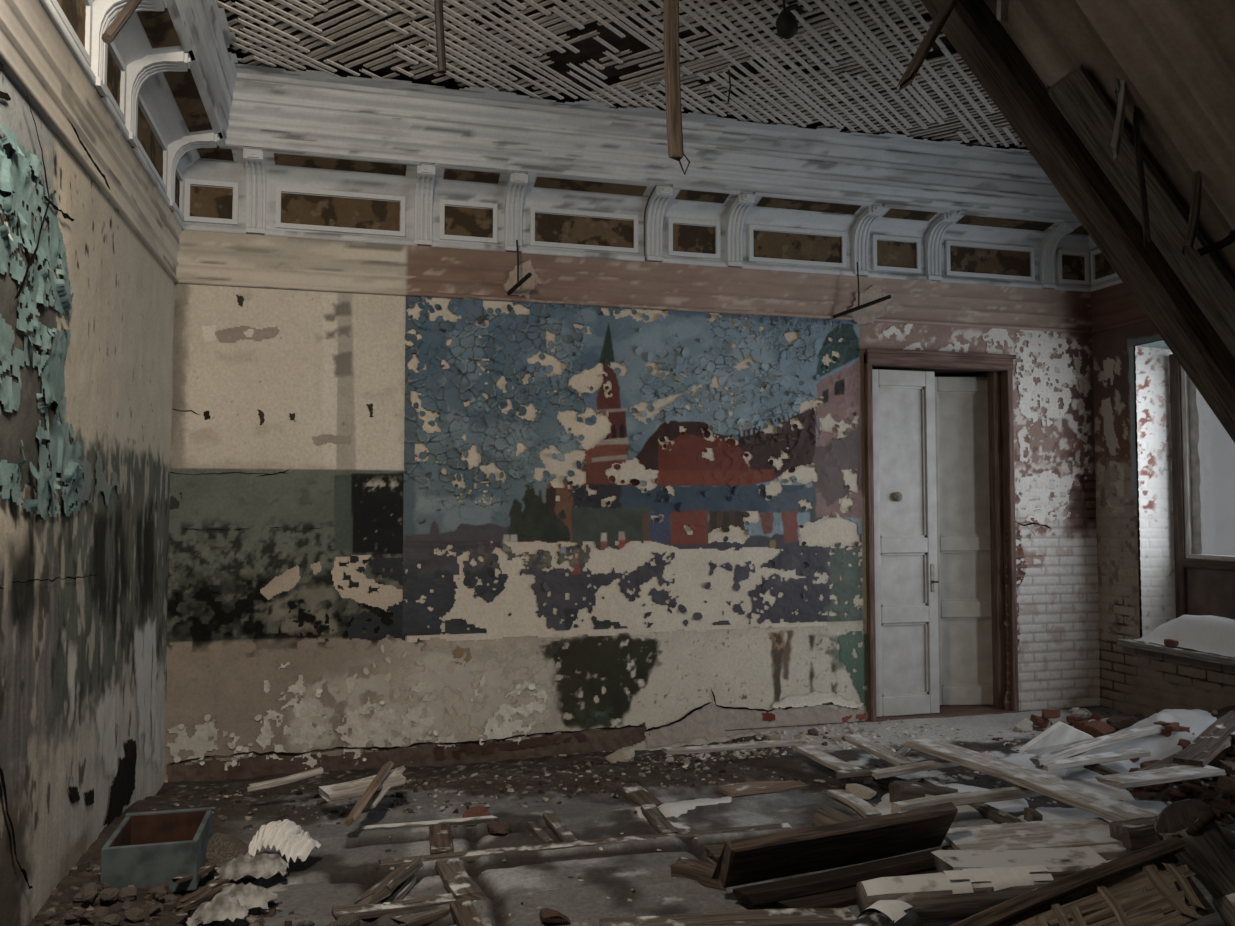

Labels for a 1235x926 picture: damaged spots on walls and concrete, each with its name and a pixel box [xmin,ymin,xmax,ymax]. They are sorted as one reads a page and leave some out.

peeling [0,124,120,523]
peeling [202,325,280,343]
peeling [411,391,448,478]
peeling [405,296,459,371]
spalling [477,259,542,327]
peeling [260,448,859,667]
peeling [496,320,673,524]
peeling [631,395,802,463]
peeling [784,352,859,437]
peeling [847,285,1088,710]
peeling [1097,357,1125,485]
spalling [166,630,868,782]